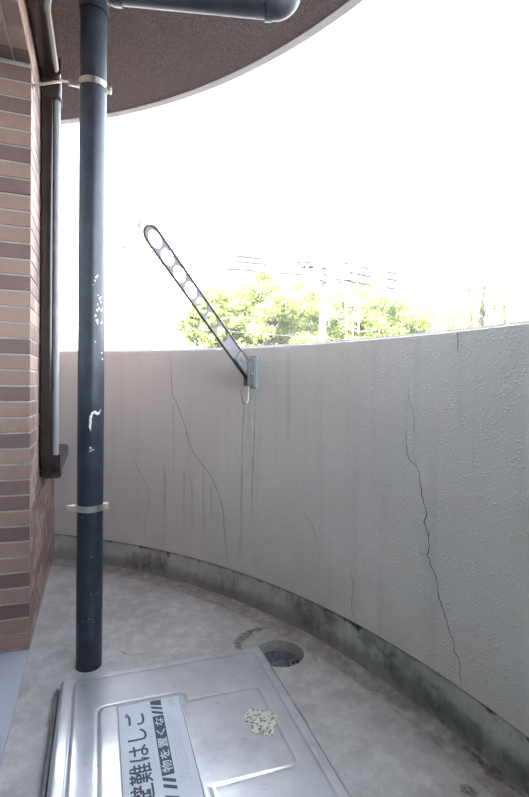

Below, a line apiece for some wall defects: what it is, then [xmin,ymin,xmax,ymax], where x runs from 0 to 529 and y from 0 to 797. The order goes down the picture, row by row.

crack [405,430,461,681]